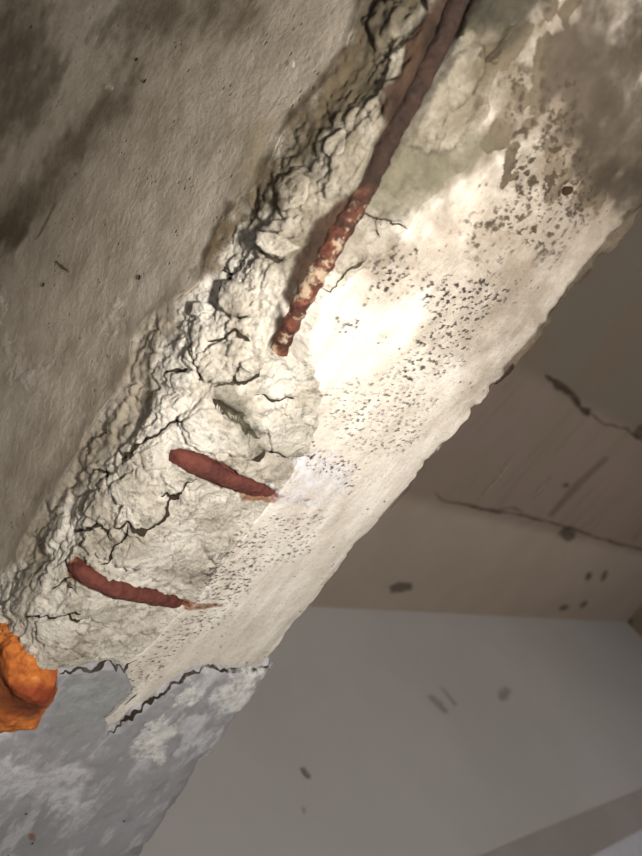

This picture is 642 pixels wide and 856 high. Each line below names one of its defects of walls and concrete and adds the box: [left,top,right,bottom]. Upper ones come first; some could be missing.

water stain [200,0,427,278]
rust [374,0,447,146]
water stain [374,0,642,373]
rust [270,193,354,345]
crack [88,419,183,484]
crack [74,479,197,565]
rust [178,449,243,476]
crack [166,316,294,462]
spalling [0,0,504,734]
water stain [321,246,510,452]
rust [181,600,220,610]
crack [104,659,270,735]